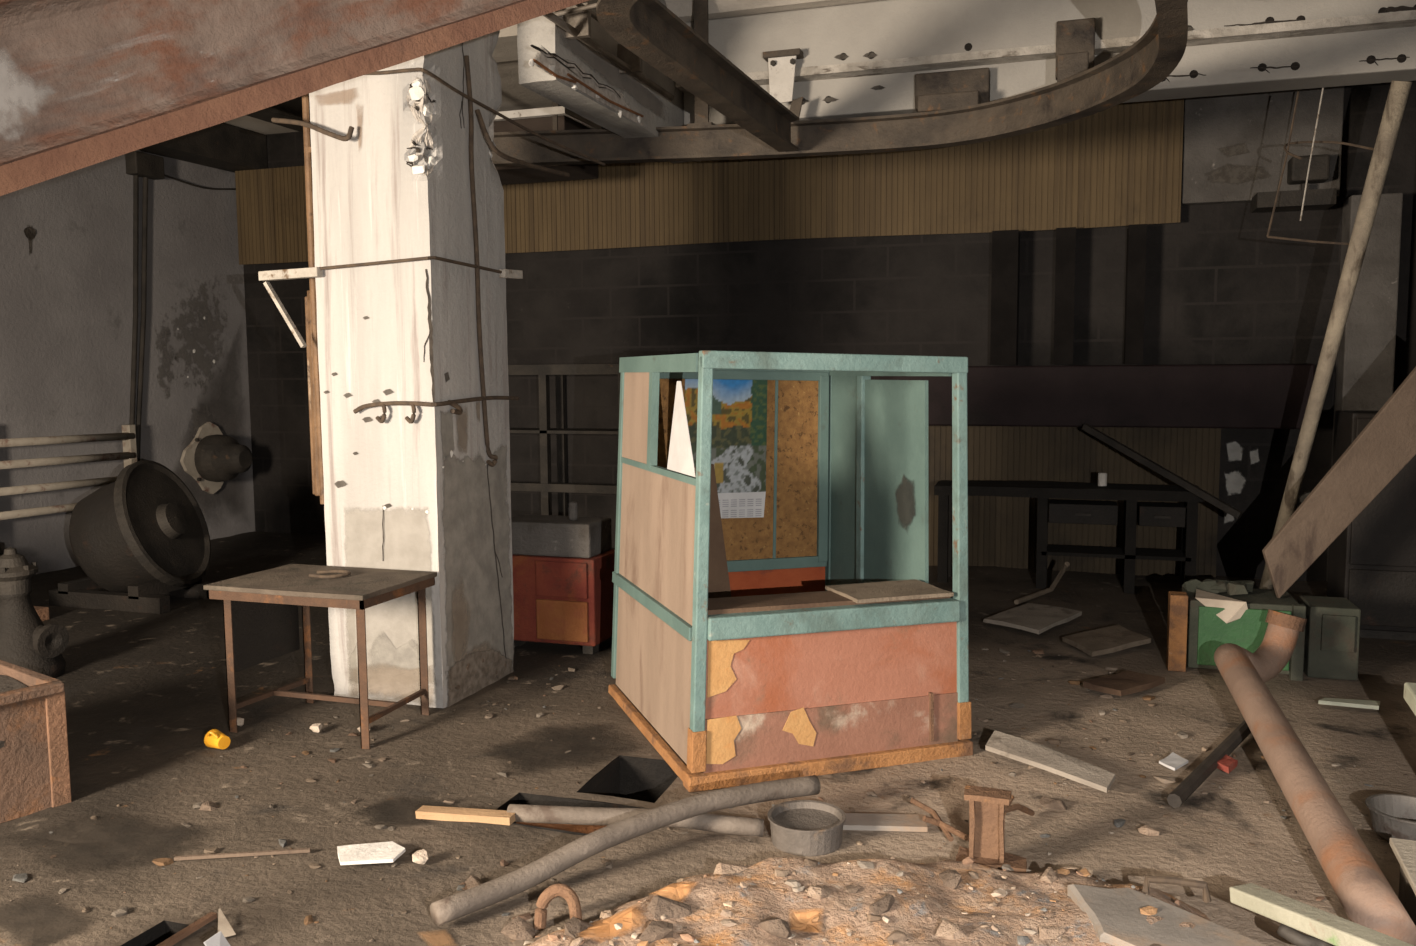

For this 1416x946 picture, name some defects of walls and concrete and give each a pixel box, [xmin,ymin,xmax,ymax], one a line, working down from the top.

spalling [406,74,436,176]
water stain [188,352,238,445]
water stain [176,466,239,509]